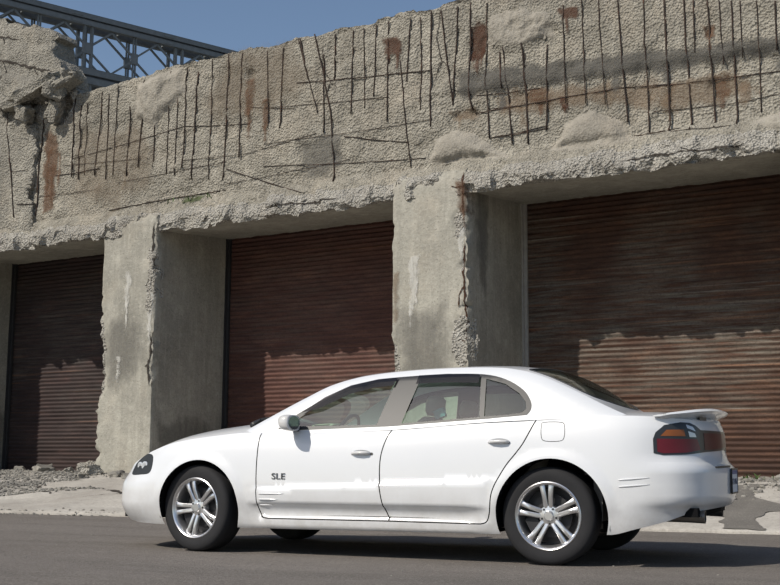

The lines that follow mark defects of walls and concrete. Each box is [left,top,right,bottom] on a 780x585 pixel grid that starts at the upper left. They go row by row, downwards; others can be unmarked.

crack [0,36,61,78]
rust [383,38,401,68]
rust [471,23,487,72]
water stain [458,39,780,107]
spalling [468,0,780,144]
spalling [0,6,458,217]
rust [43,134,61,212]
crack [622,143,743,161]
crack [146,222,156,287]
crack [452,245,470,341]
crack [145,336,153,384]
spalling [452,315,480,367]